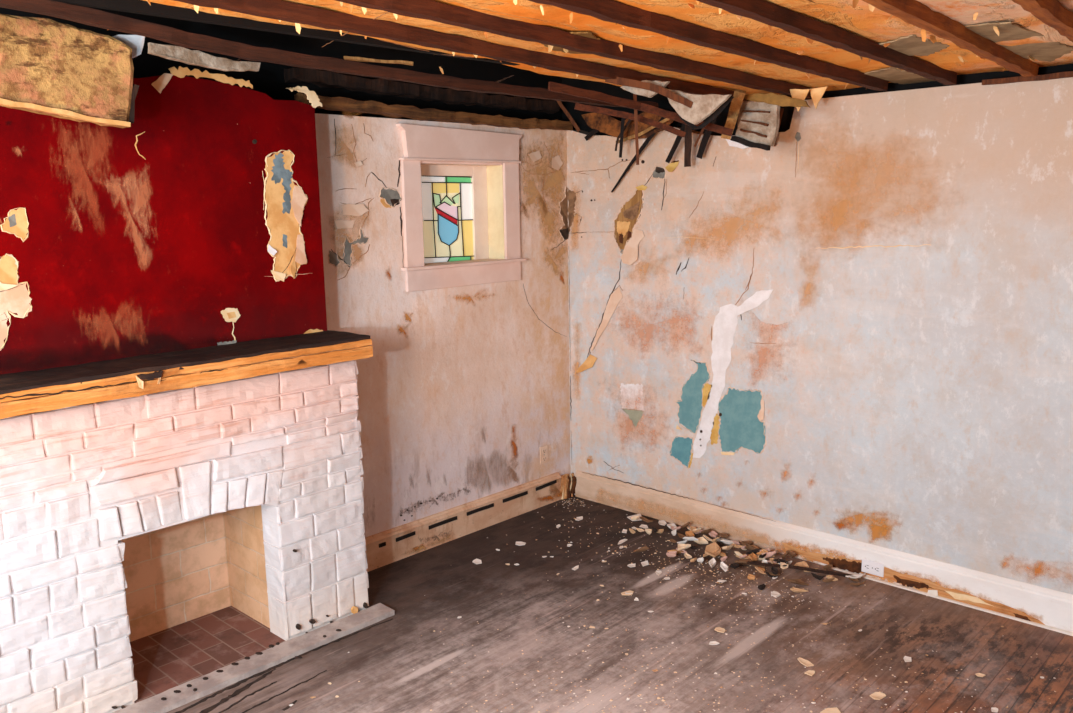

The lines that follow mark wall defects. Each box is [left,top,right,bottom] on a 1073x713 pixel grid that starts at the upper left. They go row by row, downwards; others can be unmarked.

peeling [0,207,29,242]
peeling [262,150,309,282]
flaking render [328,172,402,280]
flaking render [613,160,679,265]
peeling [0,253,32,351]
peeling [736,289,773,316]
crack [523,262,776,522]
peeling [670,360,767,469]